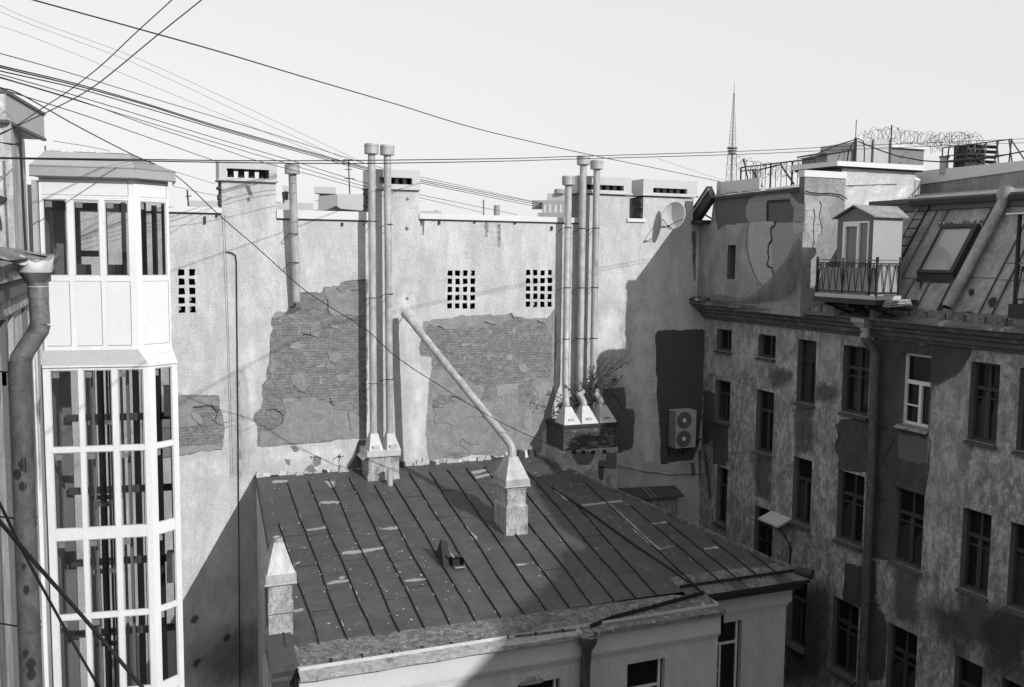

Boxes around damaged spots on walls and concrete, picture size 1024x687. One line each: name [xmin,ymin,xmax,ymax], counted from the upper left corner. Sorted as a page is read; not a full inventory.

crack [745,196,776,288]
crack [813,201,822,252]
peeling [273,285,367,350]
flaking render [420,316,552,403]
peeling [156,396,224,428]
peeling [259,373,367,447]